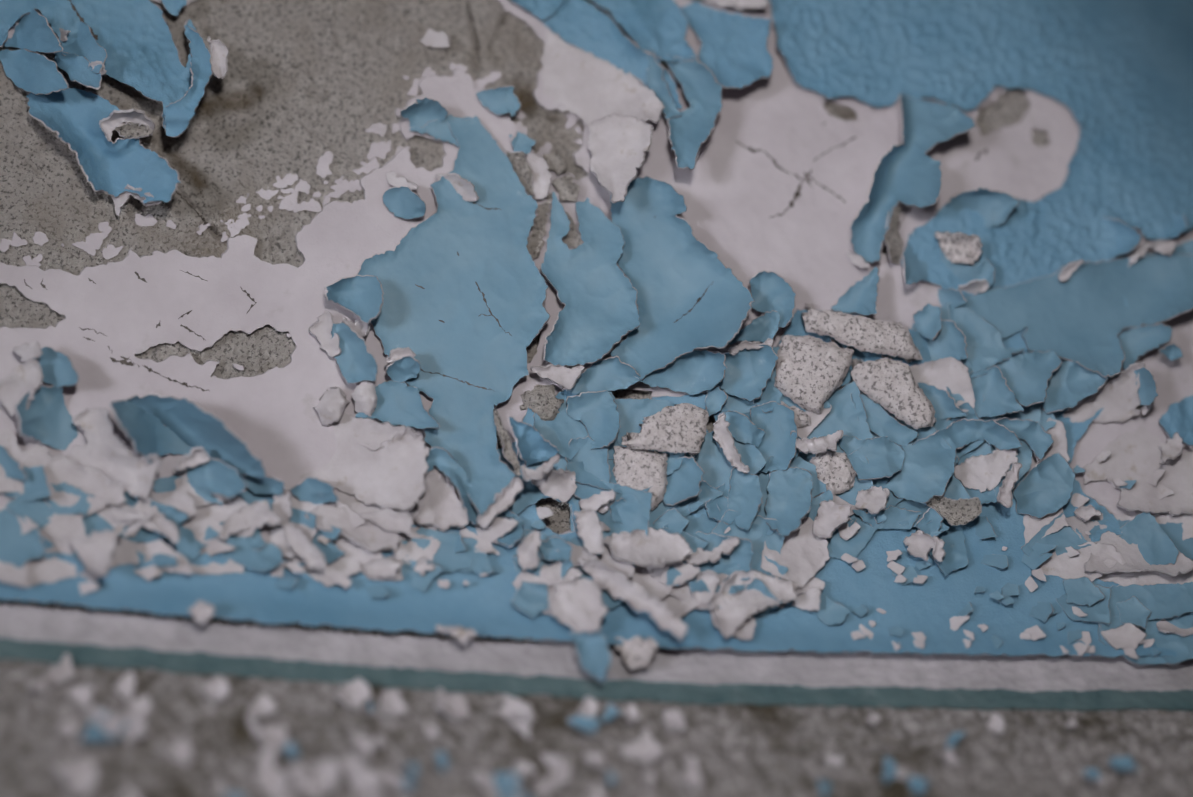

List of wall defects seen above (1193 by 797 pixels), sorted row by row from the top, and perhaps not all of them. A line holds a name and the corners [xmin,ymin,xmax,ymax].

crack [736,122,857,218]
flaking render [0,0,1193,595]
peeling [511,482,850,683]
peeling [1020,472,1193,665]
peeling [188,600,215,624]
peeling [435,624,476,644]
peeling [851,620,876,640]
peeling [888,626,926,651]
peeling [950,602,1003,649]